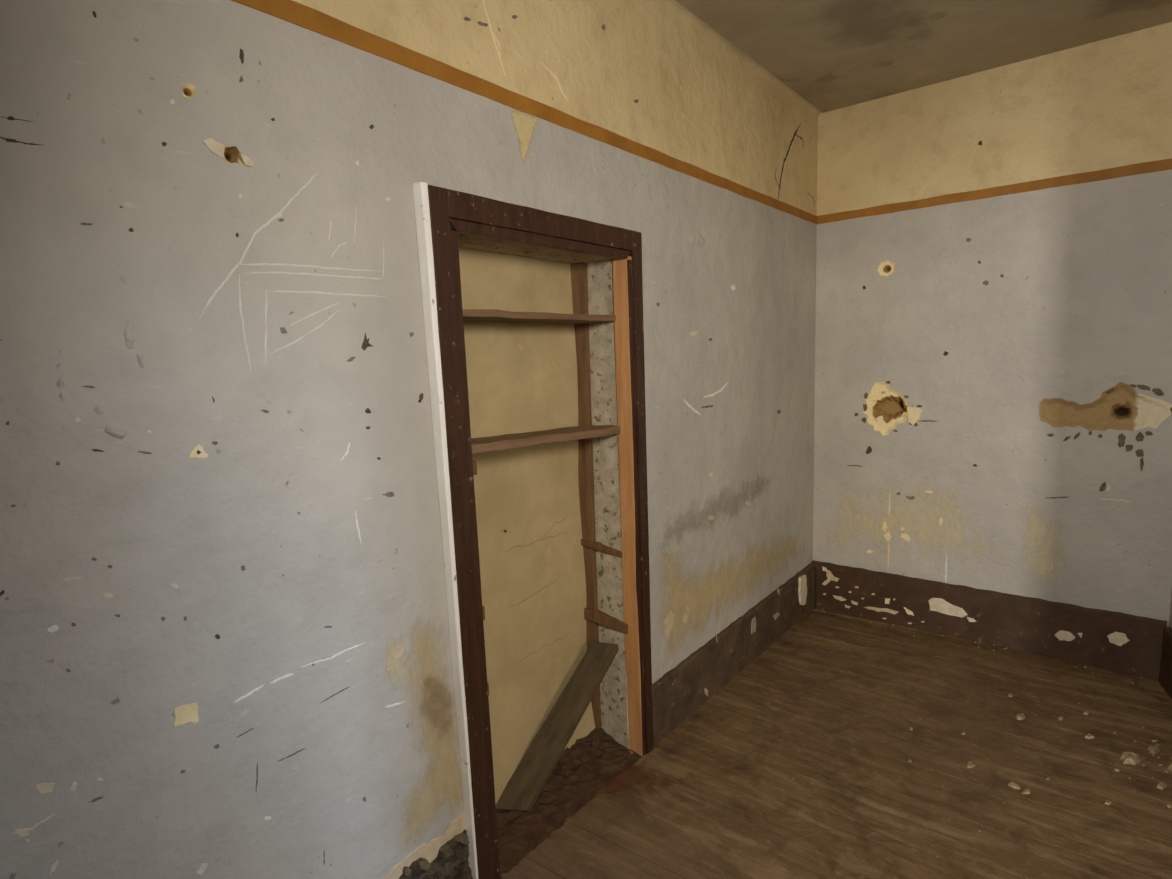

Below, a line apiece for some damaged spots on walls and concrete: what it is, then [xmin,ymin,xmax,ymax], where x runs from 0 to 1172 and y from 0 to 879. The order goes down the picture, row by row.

spalling [170,83,196,104]
spalling [202,138,254,167]
spalling [877,260,896,277]
spalling [854,381,938,436]
spalling [1039,382,1172,471]
peeling [822,566,976,624]
peeling [1054,630,1082,641]
peeling [1107,631,1130,646]
damp [410,635,462,830]
flaking render [385,812,473,879]